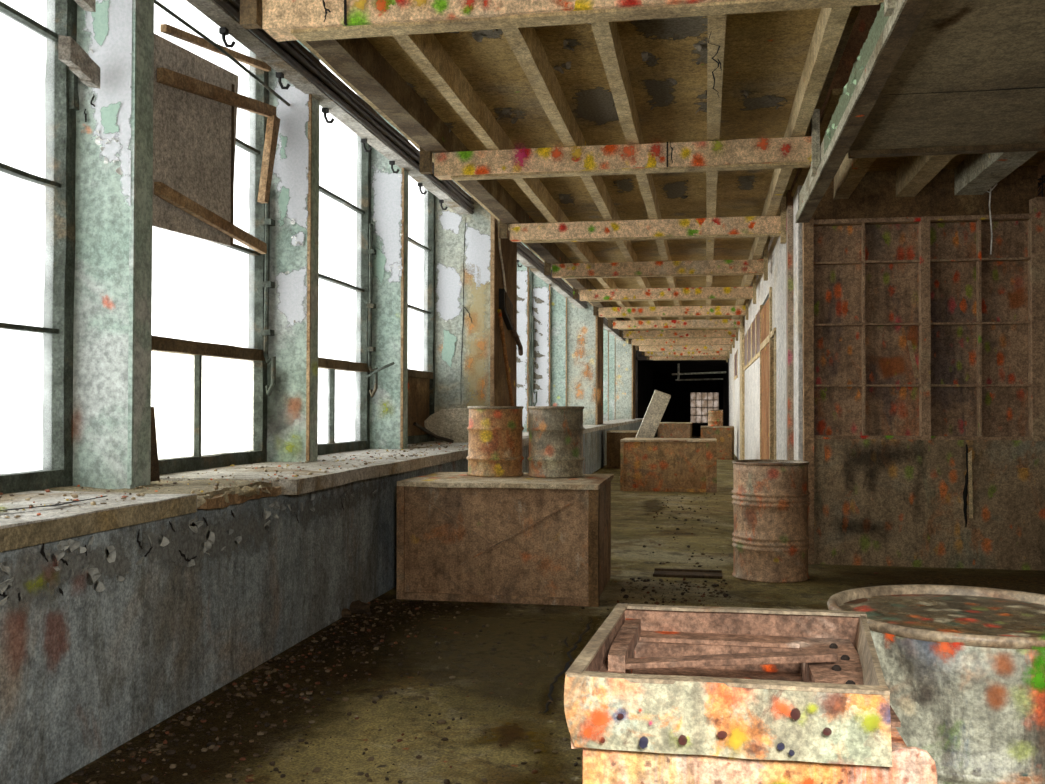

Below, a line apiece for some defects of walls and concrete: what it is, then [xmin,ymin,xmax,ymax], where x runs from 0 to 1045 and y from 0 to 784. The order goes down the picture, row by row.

peeling [68,0,132,206]
peeling [273,82,309,246]
peeling [276,266,307,327]
peeling [435,211,491,367]
crack [963,444,973,527]